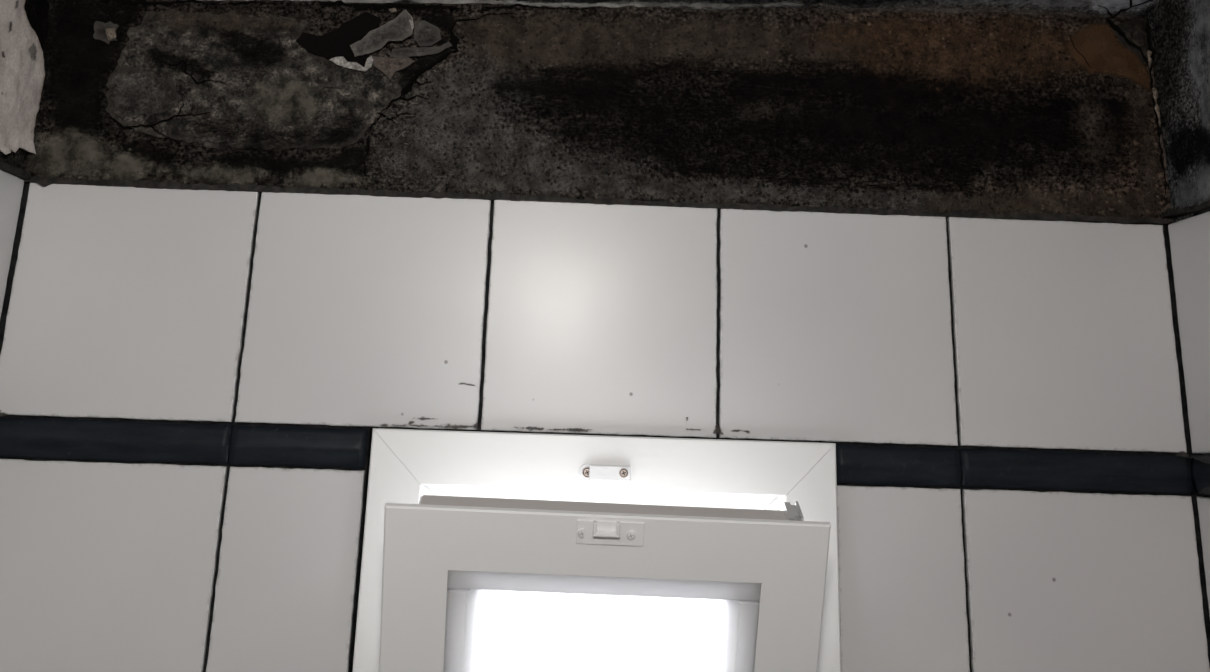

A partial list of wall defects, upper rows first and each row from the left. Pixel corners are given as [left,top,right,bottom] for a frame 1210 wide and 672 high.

peeling [0,0,45,155]
flaking render [93,0,456,159]
leakage [24,0,1157,213]
crack [1098,0,1167,201]
leakage [1168,0,1210,219]